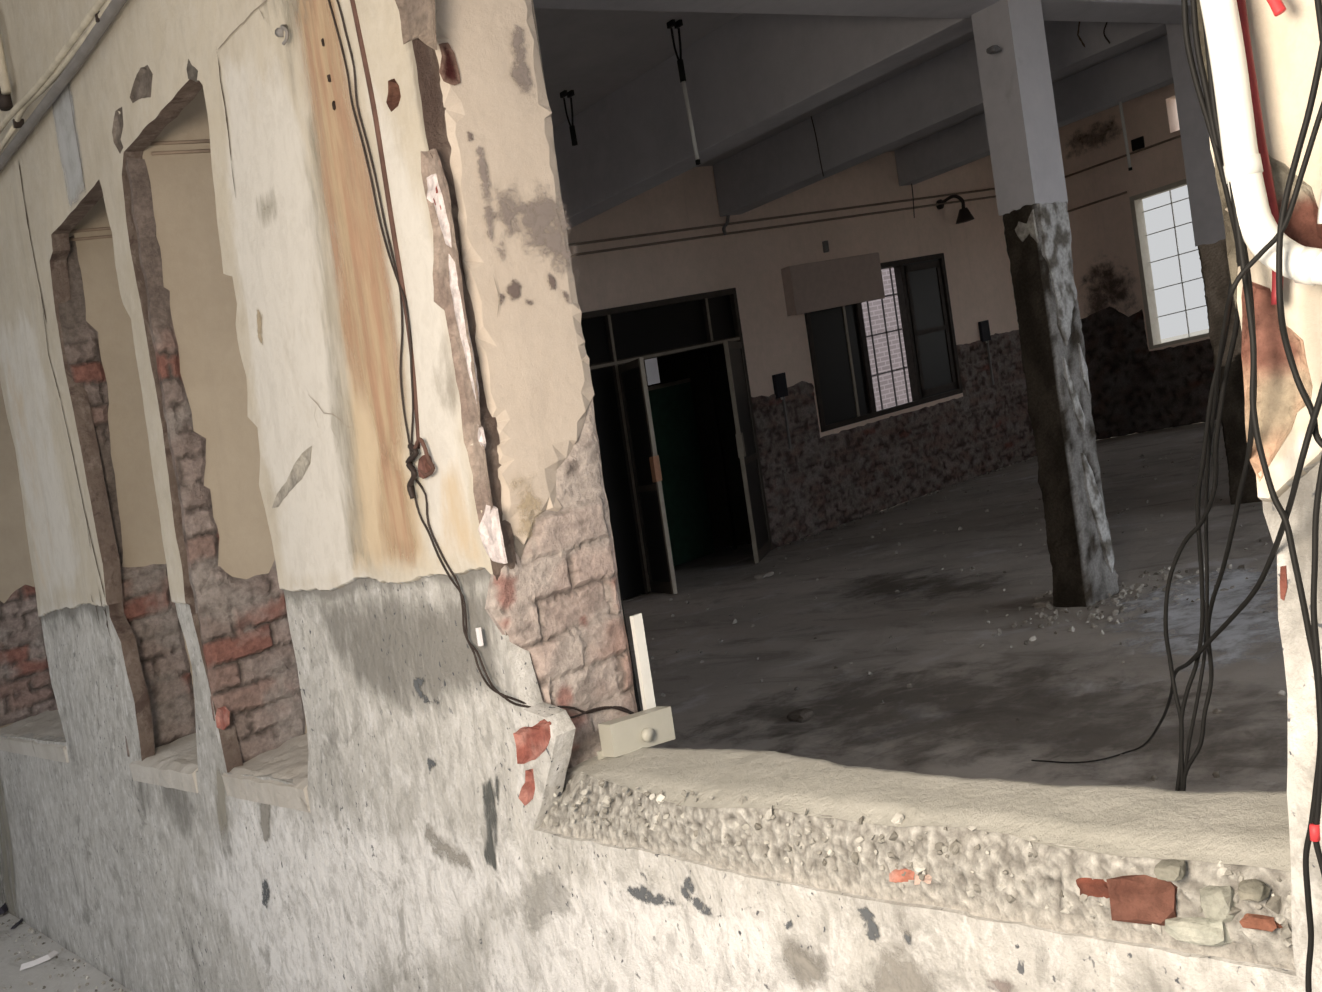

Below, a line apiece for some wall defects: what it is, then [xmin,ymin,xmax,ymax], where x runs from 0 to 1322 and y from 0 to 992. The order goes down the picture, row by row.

flaking render [395,0,461,86]
peeling [511,26,532,92]
peeling [467,132,494,238]
corrosion [296,0,415,559]
flaking render [1015,201,1218,440]
flaking render [58,65,312,763]
flaking render [420,148,638,806]
peeling [1080,453,1114,574]
flaking render [0,585,58,727]
peeling [858,907,879,942]